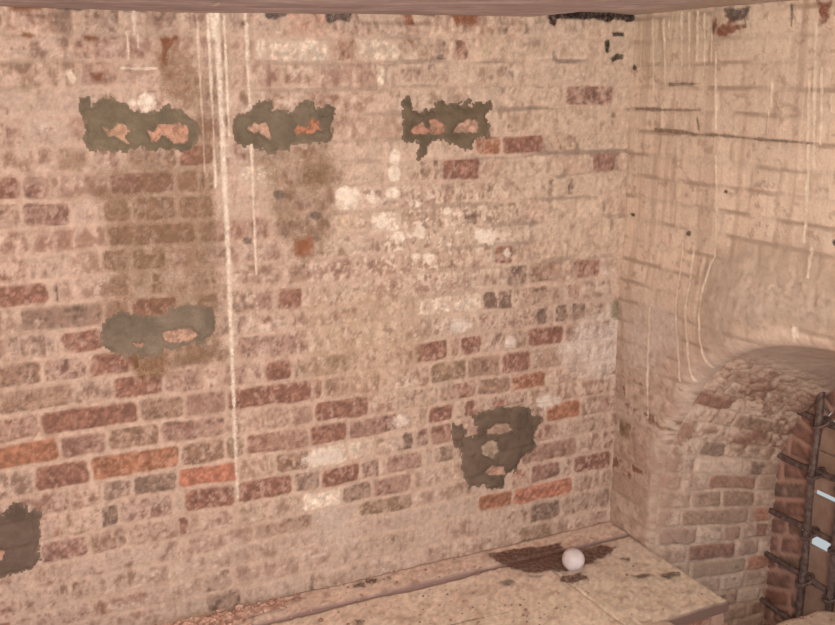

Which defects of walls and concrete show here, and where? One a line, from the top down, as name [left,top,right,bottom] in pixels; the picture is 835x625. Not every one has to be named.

water stain [242,13,251,107]
water stain [651,9,718,131]
flaking render [103,124,130,144]
flaking render [148,122,188,144]
flaking render [248,122,271,140]
flaking render [411,119,478,135]
water stain [791,22,824,344]
water stain [241,142,426,275]
water stain [473,229,496,246]
water stain [411,252,435,266]
flaking render [163,328,197,344]
flaking render [481,423,512,475]